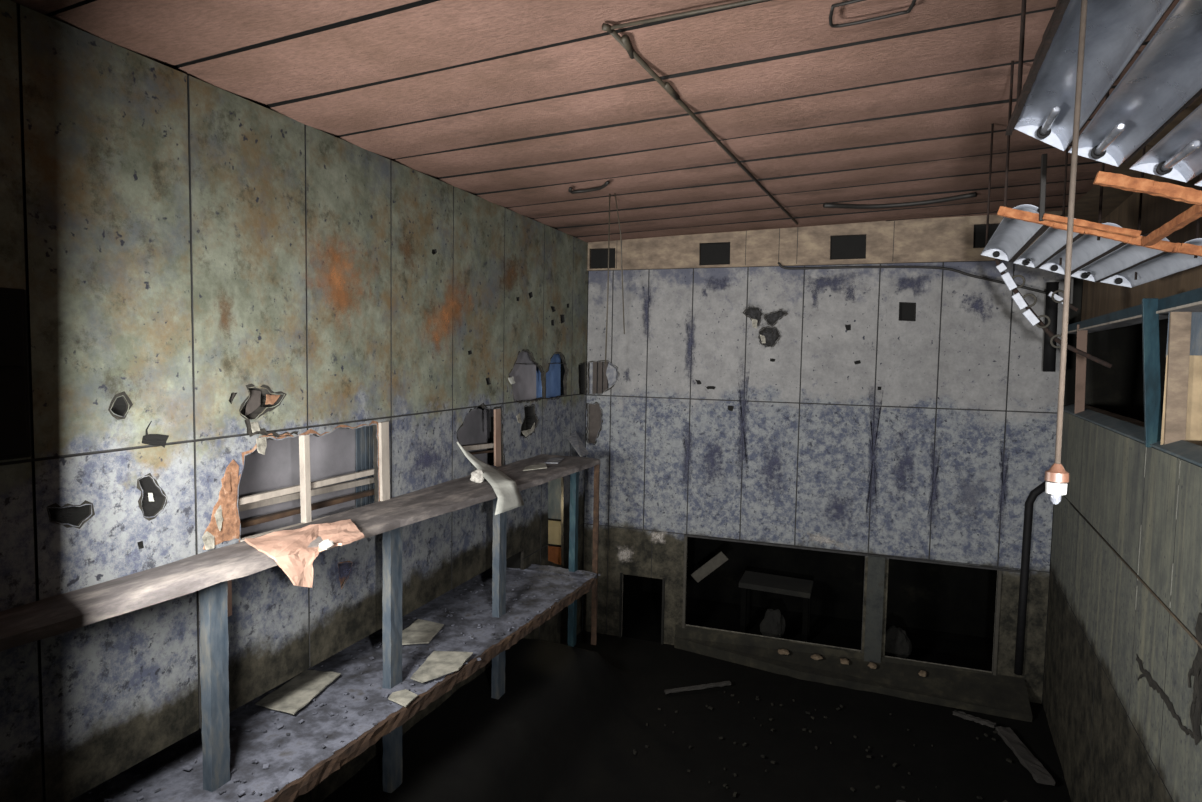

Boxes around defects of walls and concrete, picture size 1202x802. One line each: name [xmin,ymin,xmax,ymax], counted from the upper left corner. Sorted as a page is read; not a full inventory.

damp [643,291,652,334]
damp [686,324,695,374]
spalling [743,305,788,362]
spalling [137,473,167,521]
peeling [202,384,380,550]
spalling [457,349,619,467]
damp [683,433,723,486]
damp [738,380,748,468]
damp [762,446,781,494]
damp [868,396,880,503]
damp [892,433,941,519]
damp [998,452,1008,524]